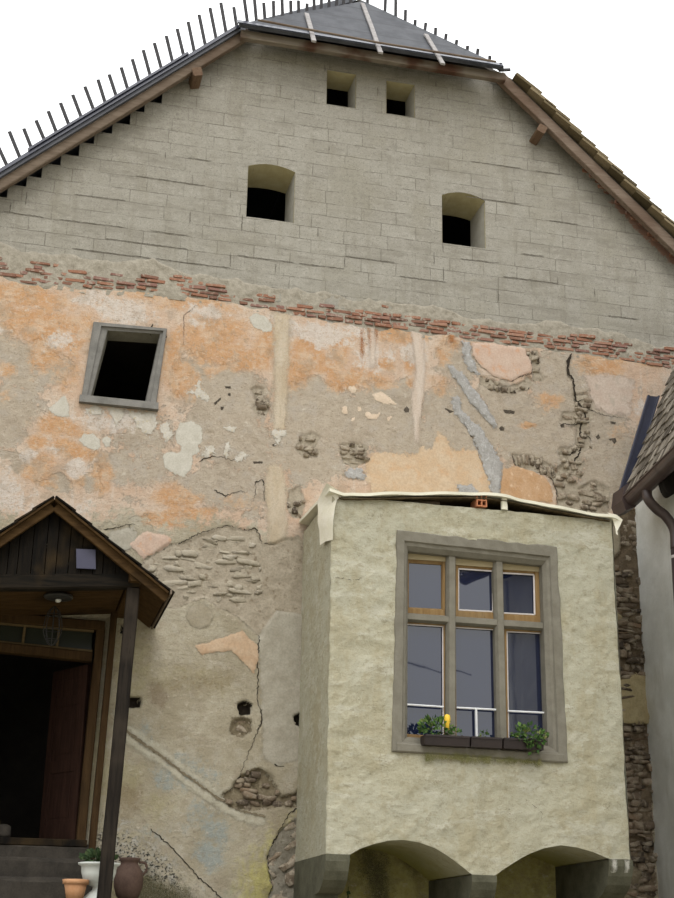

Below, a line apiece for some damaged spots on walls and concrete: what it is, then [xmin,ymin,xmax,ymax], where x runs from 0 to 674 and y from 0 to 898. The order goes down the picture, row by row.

spalling [251,388,270,416]
peeling [339,372,637,514]
peeling [471,342,544,394]
crack [559,353,623,461]
spalling [130,526,303,673]
crack [164,525,272,550]
spalling [614,509,646,711]
crack [230,635,263,790]
crack [151,829,221,898]
spalling [222,766,309,898]
damp [348,849,400,898]
spalling [623,722,658,898]